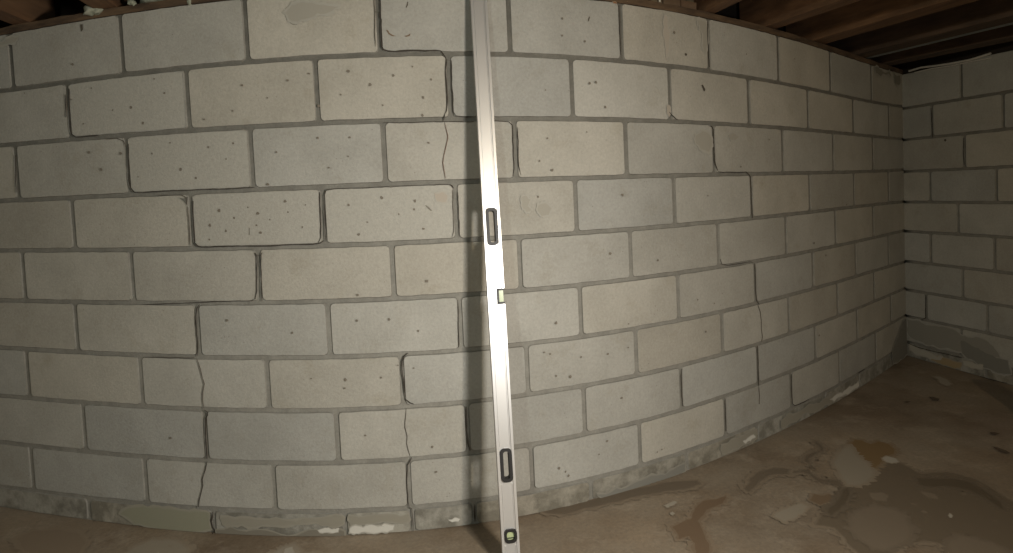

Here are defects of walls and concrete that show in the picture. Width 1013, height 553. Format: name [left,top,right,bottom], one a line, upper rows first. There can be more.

crack [499,121,521,174]
crack [710,126,753,218]
crack [65,0,473,534]
damp [720,429,758,455]
damp [118,504,411,553]
damp [737,439,1013,553]